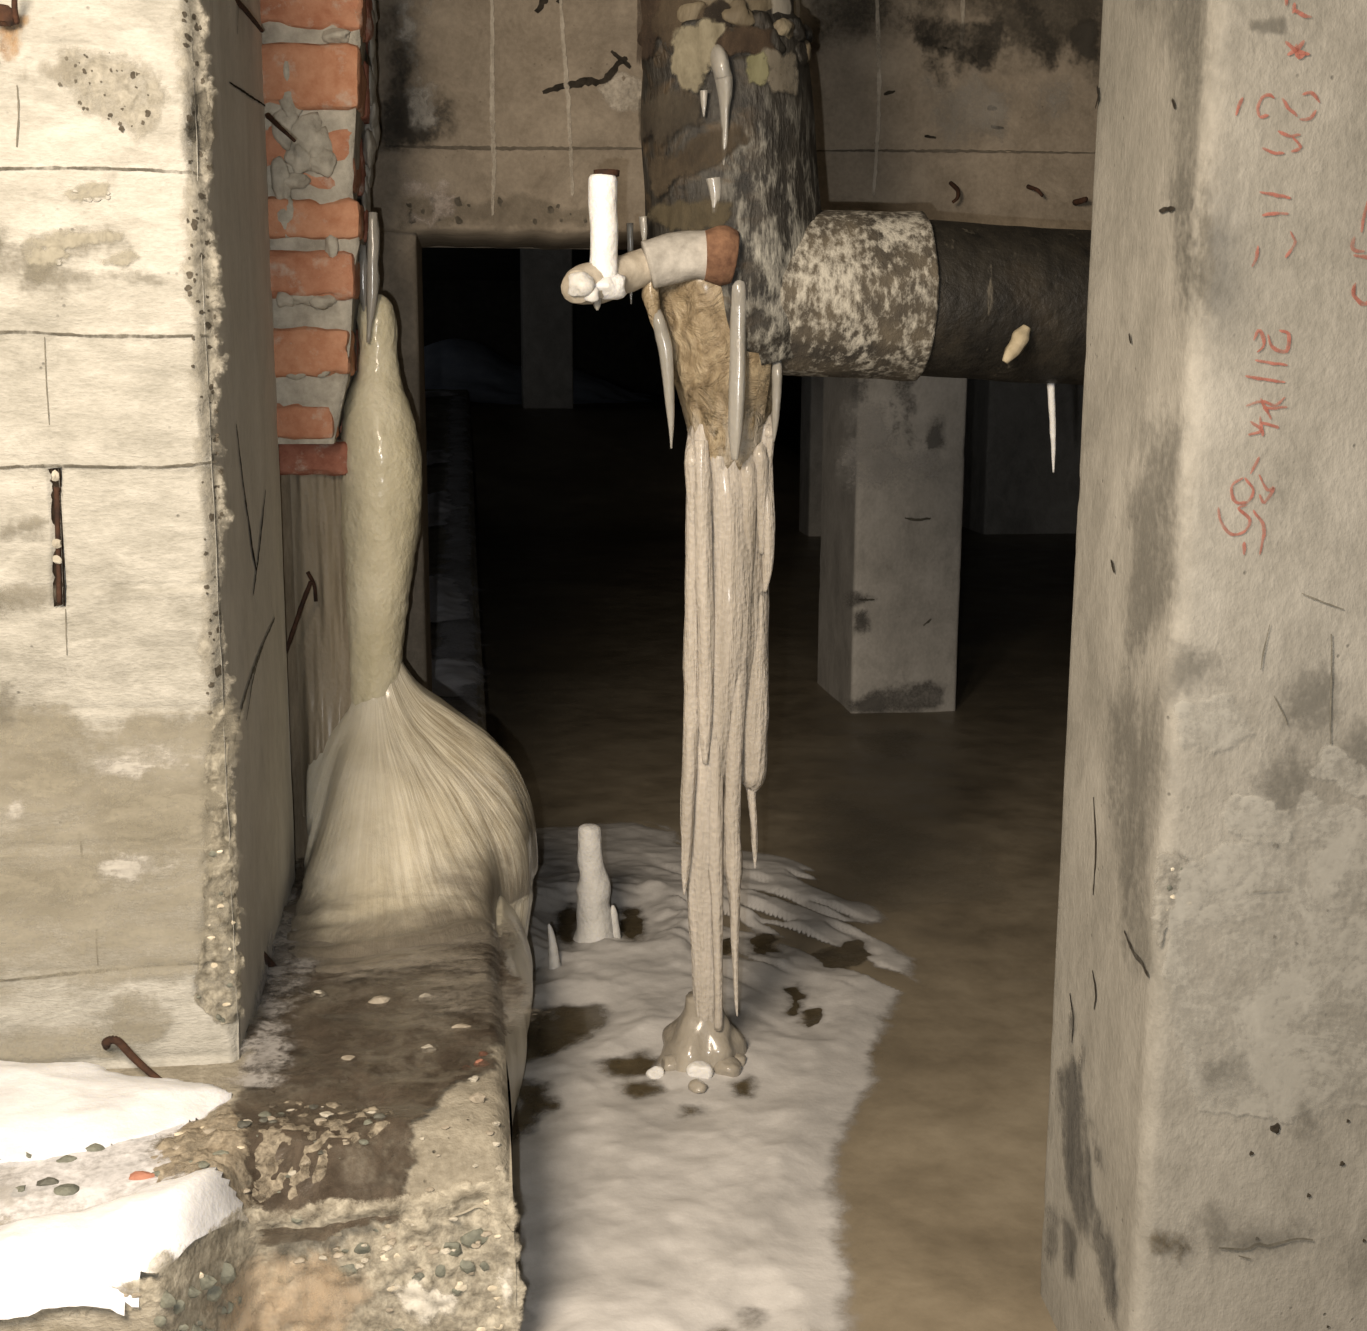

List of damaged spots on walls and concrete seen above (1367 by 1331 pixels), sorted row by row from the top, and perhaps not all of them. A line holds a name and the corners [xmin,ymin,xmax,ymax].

crack [542,50,631,94]
damp [1,256,78,285]
corrosion [49,468,65,607]
spalling [0,1170,526,1331]
damp [1044,1209,1075,1277]